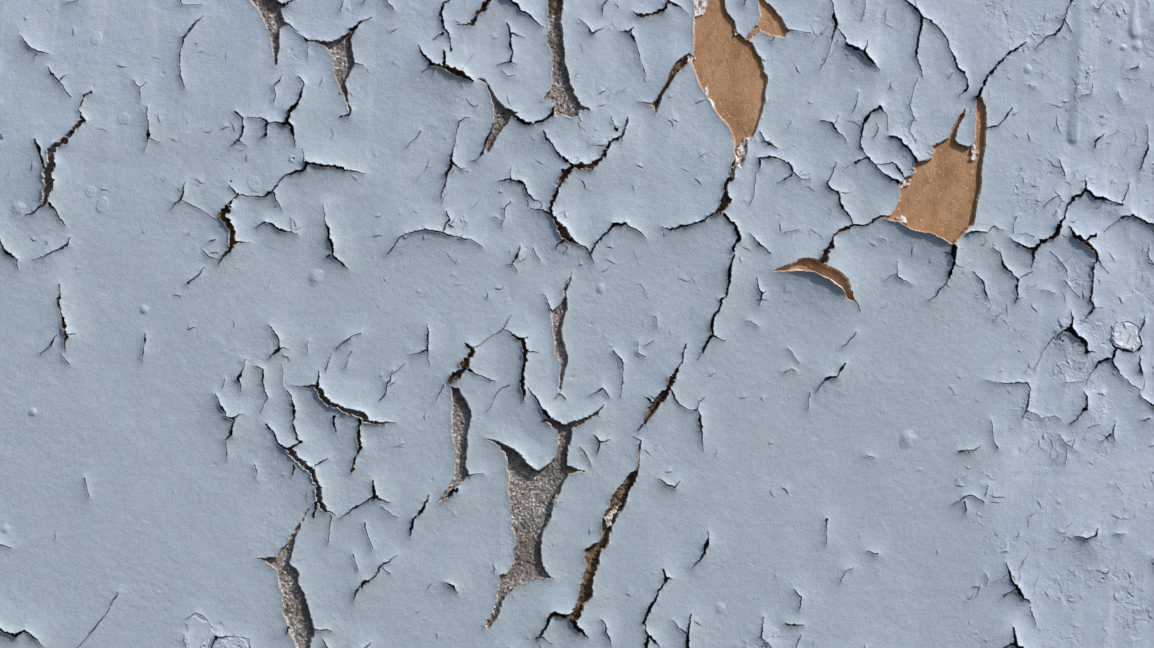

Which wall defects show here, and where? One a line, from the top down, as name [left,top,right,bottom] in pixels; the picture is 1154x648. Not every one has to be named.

crack [169,74,366,285]
crack [211,324,362,479]
peeling [256,353,398,648]
crack [327,478,465,603]
peeling [415,0,592,163]
peeling [484,271,605,630]
peeling [530,436,643,647]
crack [601,531,713,648]
peeling [636,0,811,181]
crack [378,0,1105,468]
peeling [769,96,994,312]
crack [972,126,1154,467]